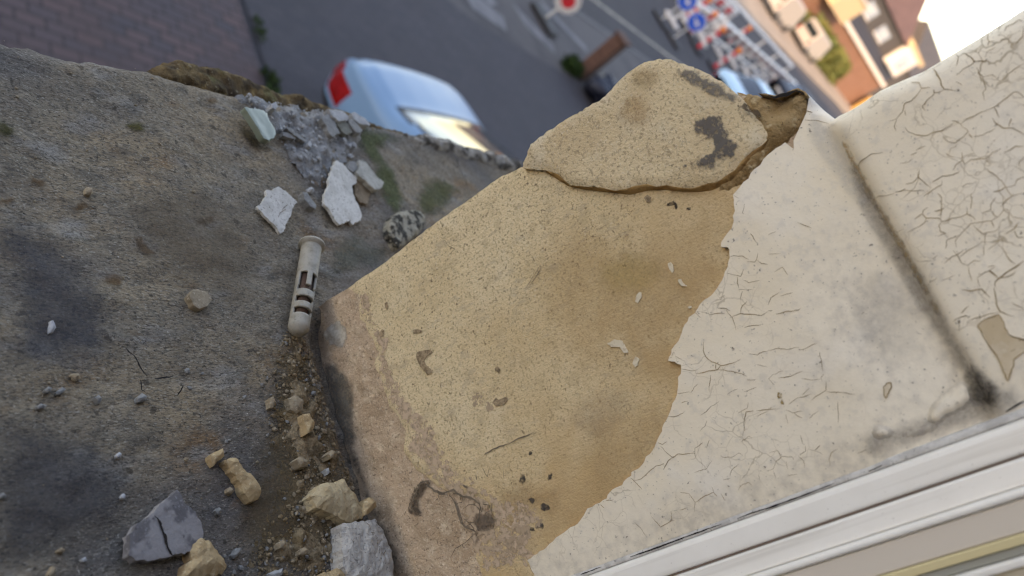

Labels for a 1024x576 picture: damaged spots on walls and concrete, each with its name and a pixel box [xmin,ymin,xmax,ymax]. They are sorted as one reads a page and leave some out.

leakage [325,366,363,480]
peeling [147,60,810,576]
crack [696,195,801,328]
crack [630,342,882,557]
crack [858,19,1024,327]
peeling [977,314,1024,381]